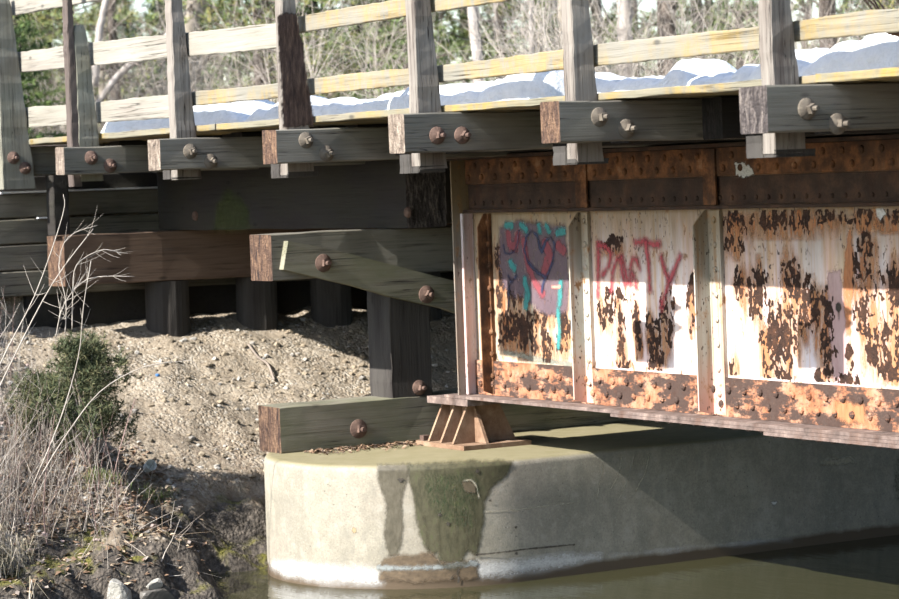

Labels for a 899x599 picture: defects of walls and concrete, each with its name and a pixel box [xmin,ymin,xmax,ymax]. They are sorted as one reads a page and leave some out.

corrosion [600,233,623,256]
corrosion [494,243,571,363]
corrosion [596,286,675,371]
corrosion [686,272,696,337]
corrosion [722,208,899,386]
corrosion [835,401,865,424]
leakage [377,463,410,556]